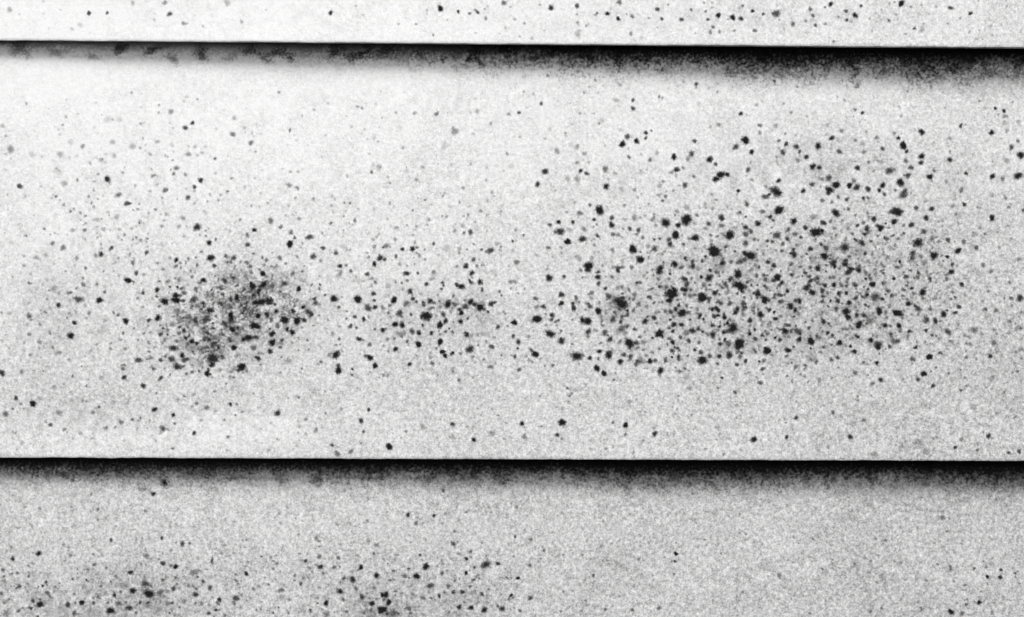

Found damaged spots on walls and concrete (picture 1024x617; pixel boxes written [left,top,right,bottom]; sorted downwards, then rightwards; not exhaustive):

water stain [124,219,539,379]
water stain [532,136,978,384]